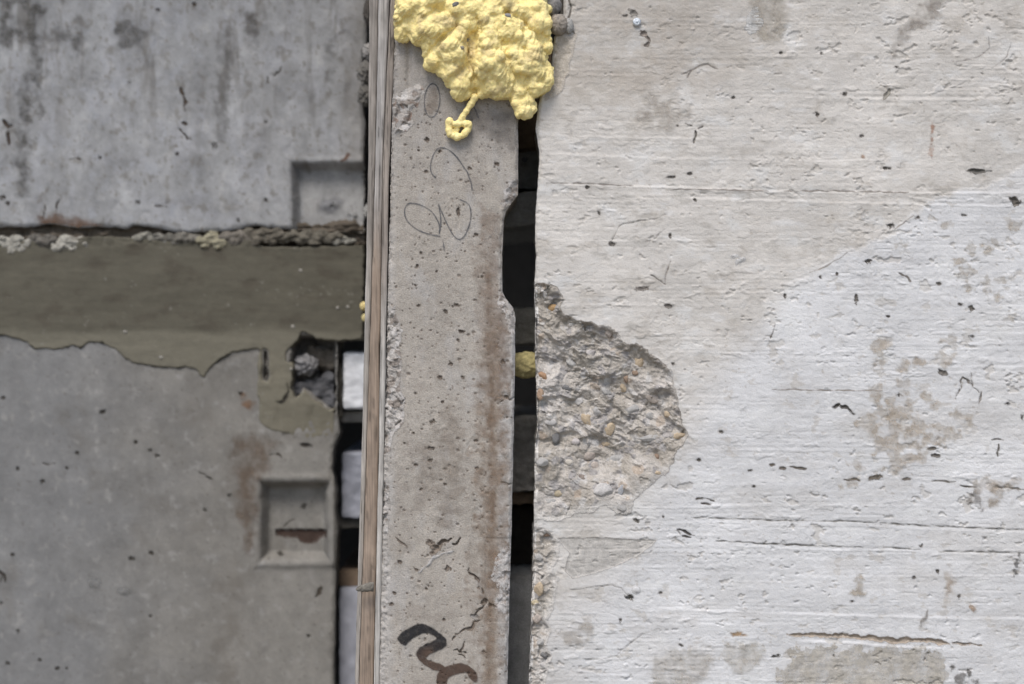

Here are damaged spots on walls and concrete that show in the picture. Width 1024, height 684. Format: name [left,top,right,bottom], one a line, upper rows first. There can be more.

spalling [294,341,345,419]
spalling [529,283,688,684]